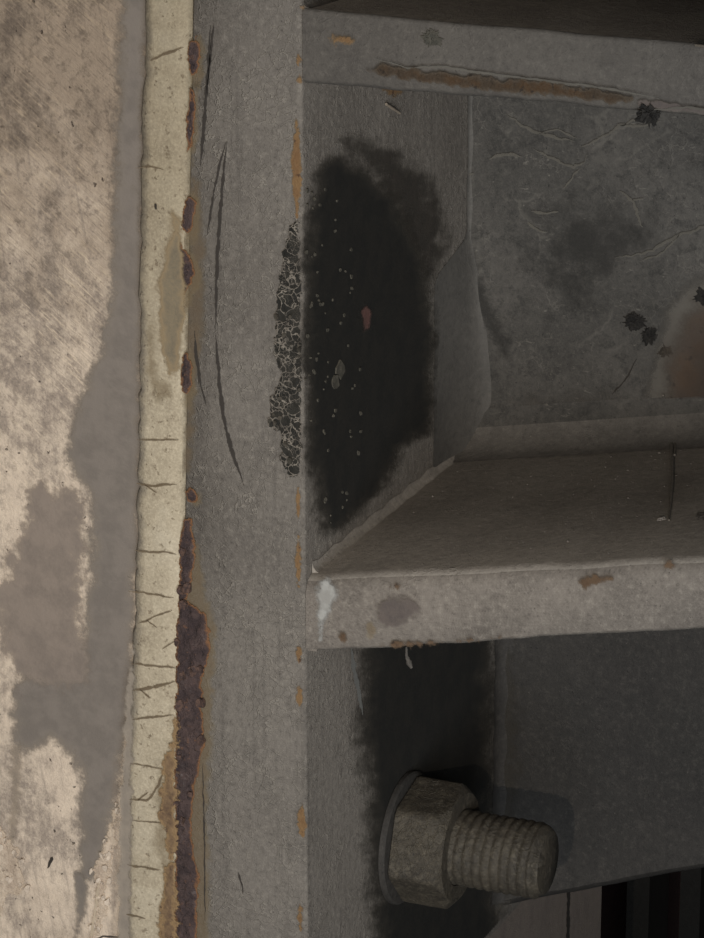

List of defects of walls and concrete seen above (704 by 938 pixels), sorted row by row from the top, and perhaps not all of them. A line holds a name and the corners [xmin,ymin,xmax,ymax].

rust [186,88,196,152]
rust [187,41,201,75]
rust [366,63,704,115]
leakage [345,139,444,276]
rust [180,179,205,398]
leakage [0,0,146,932]
rust [184,409,193,469]
rust [157,518,211,938]